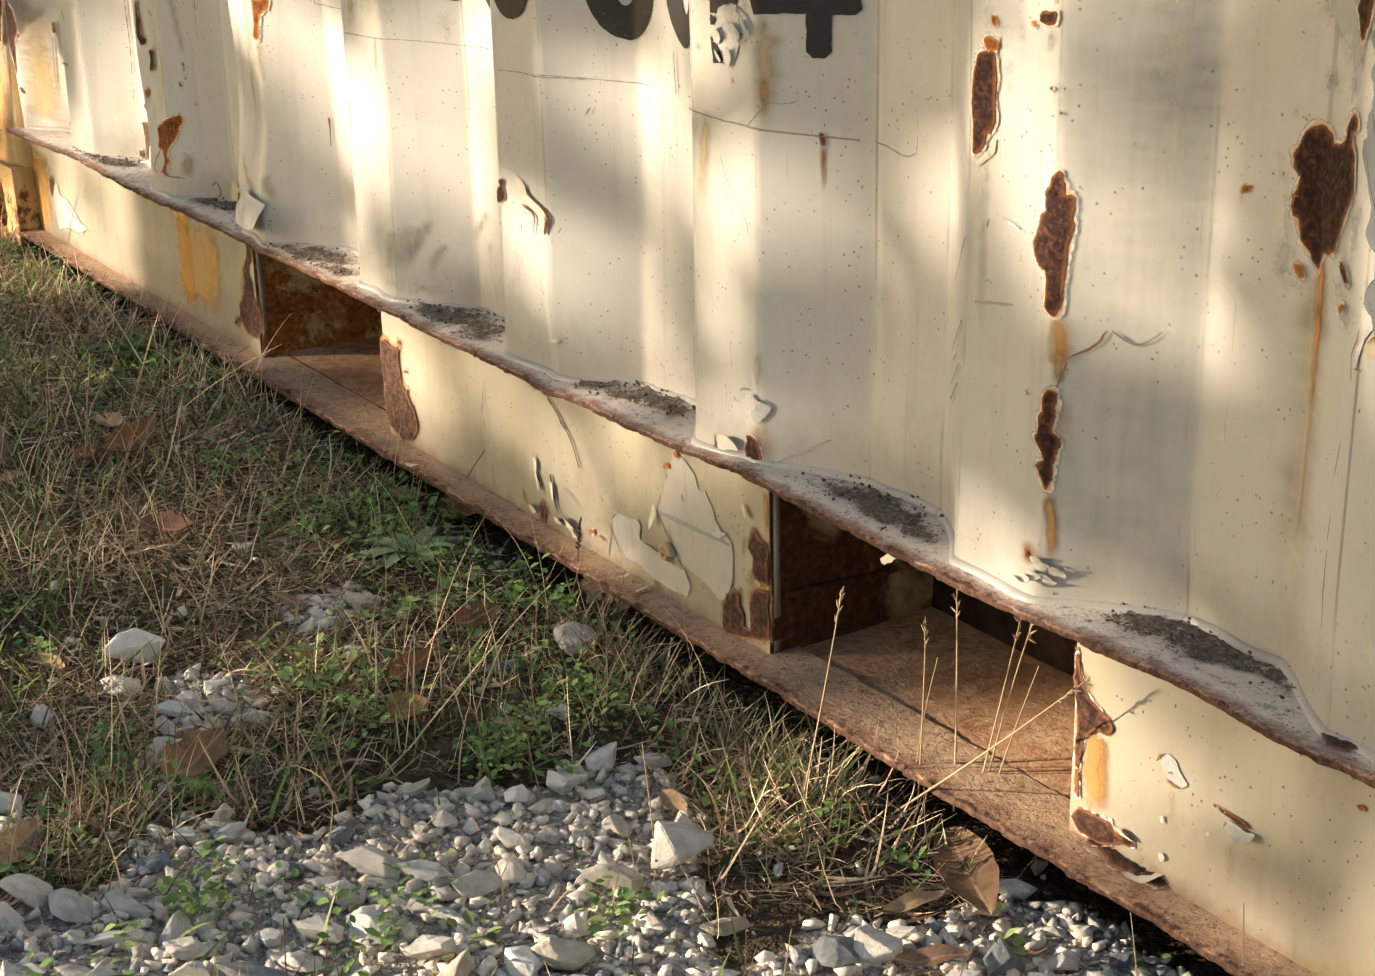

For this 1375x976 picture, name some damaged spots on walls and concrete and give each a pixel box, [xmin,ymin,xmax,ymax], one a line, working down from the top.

corrosion [250,0,270,60]
corrosion [970,14,1001,166]
corrosion [1356,0,1375,46]
corrosion [1288,108,1360,400]
corrosion [380,336,419,442]
corrosion [1026,169,1078,550]
peeling [1350,307,1375,374]
peeling [589,451,733,601]
corrosion [722,495,772,644]
corrosion [1071,646,1168,888]
peeling [1157,753,1188,789]
peeling [1206,804,1254,843]